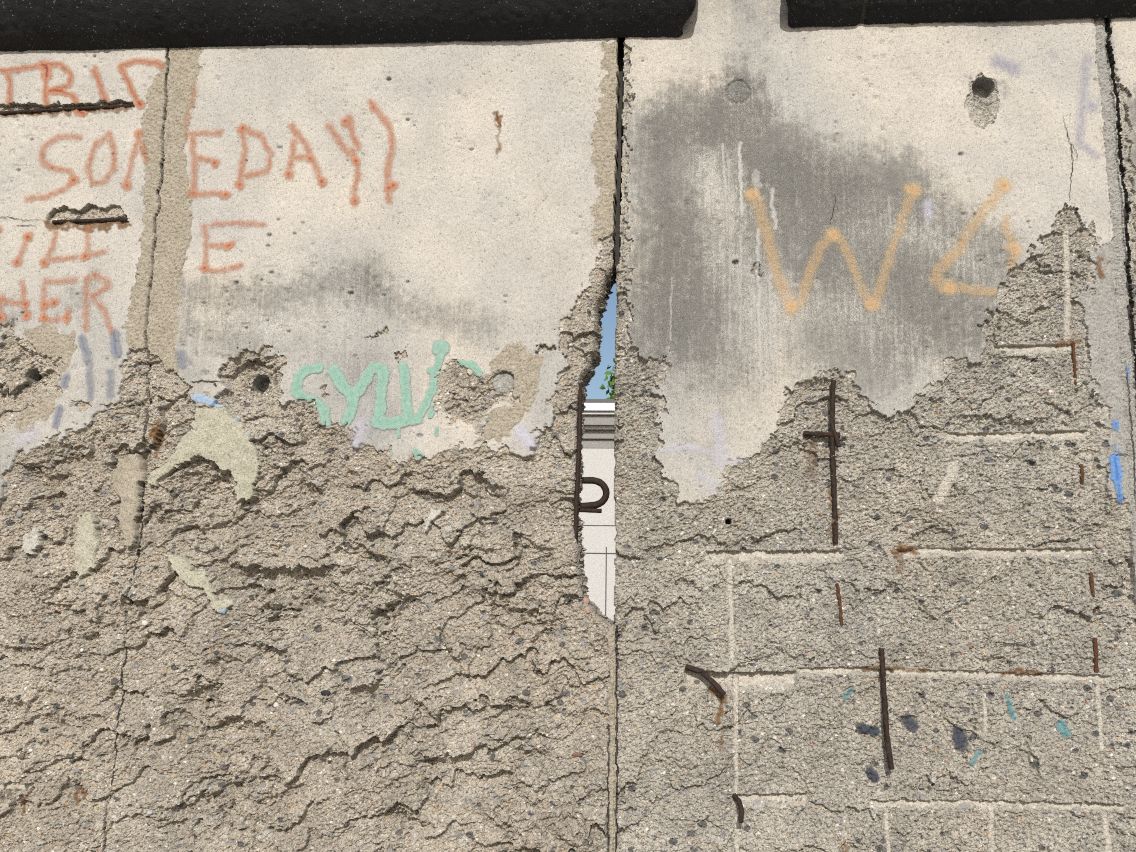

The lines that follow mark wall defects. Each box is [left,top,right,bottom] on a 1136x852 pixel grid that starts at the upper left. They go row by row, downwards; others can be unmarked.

leakage [626,67,1012,402]
crack [105,488,145,840]
spalling [0,233,616,852]
rust [709,687,727,724]
spalling [614,42,1136,852]